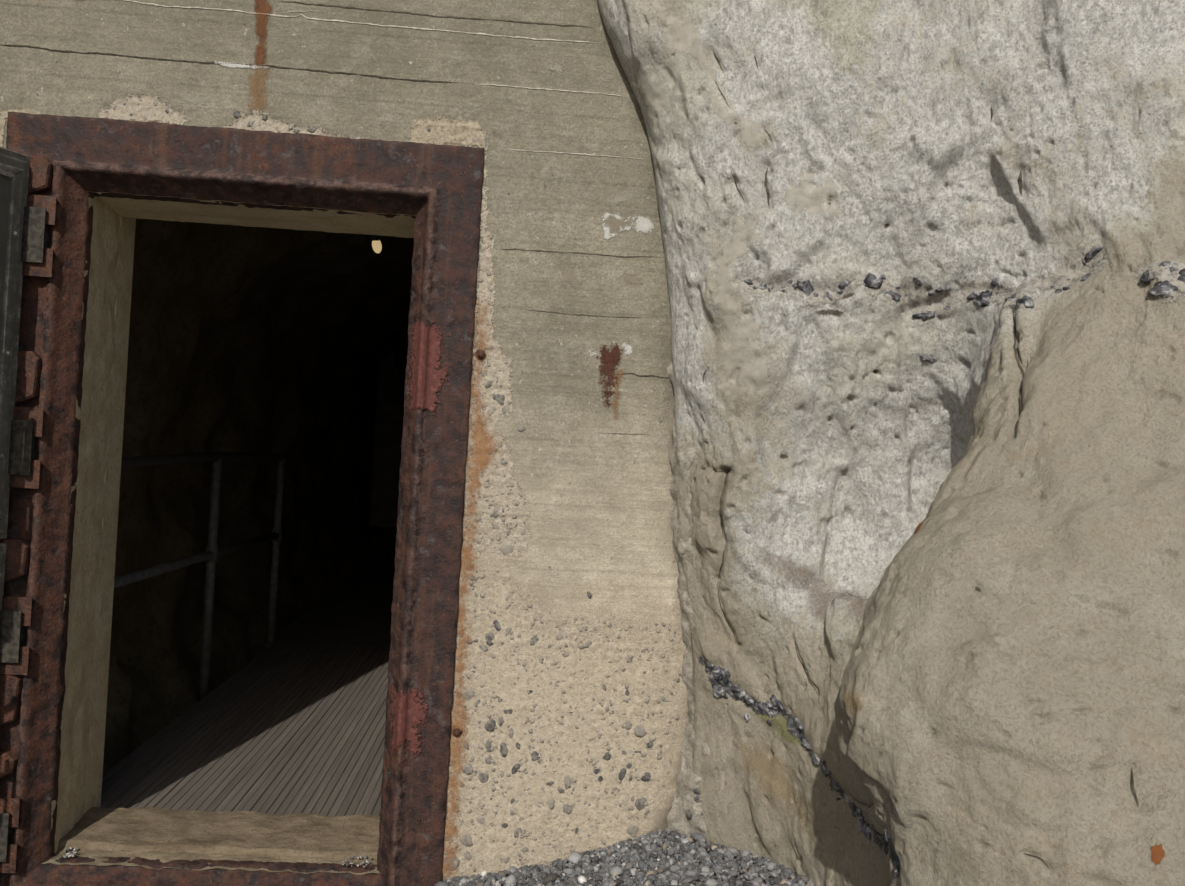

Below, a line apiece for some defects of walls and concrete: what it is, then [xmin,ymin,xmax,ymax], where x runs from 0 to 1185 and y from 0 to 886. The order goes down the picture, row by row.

corrosion [250,0,272,110]
crack [0,44,627,98]
spalling [98,93,188,125]
corrosion [596,342,623,416]
spalling [406,115,688,884]
corrosion [443,305,498,875]
peeling [388,684,431,757]